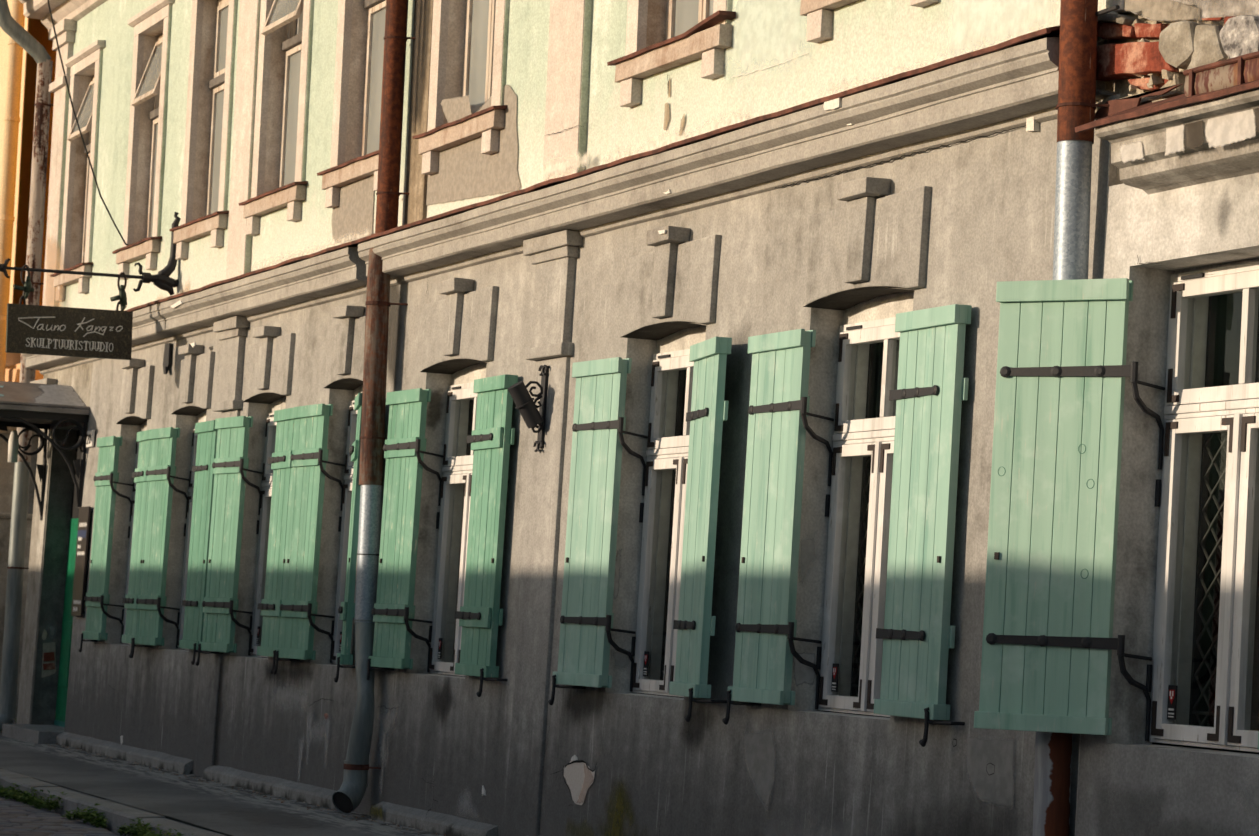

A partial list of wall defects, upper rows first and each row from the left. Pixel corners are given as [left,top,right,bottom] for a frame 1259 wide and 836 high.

rust [1057,0,1098,144]
peeling [1120,142,1143,163]
peeling [1165,125,1184,155]
peeling [1205,109,1256,148]
spalling [553,755,597,805]